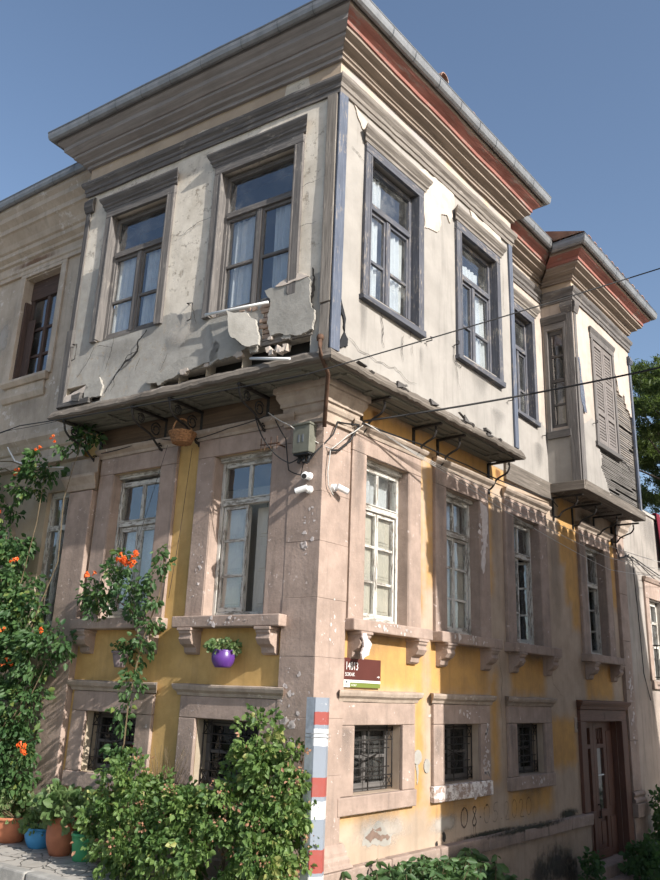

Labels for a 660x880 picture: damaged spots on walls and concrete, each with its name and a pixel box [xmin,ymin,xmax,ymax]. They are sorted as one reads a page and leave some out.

crack [77,330,147,393]
flaking render [145,273,316,387]
peeling [280,683,300,748]
flaking render [362,821,392,847]